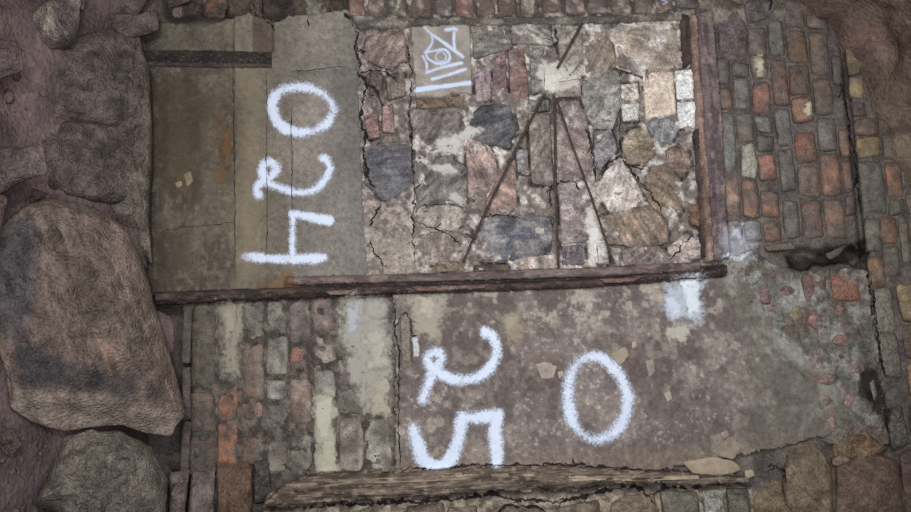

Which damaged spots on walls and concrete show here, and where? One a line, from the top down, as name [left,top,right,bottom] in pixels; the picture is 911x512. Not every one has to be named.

crack [160,36,236,255]
crack [265,78,293,264]
crack [288,7,518,270]
water stain [664,273,705,342]
water stain [719,222,758,261]
spalling [764,239,866,271]